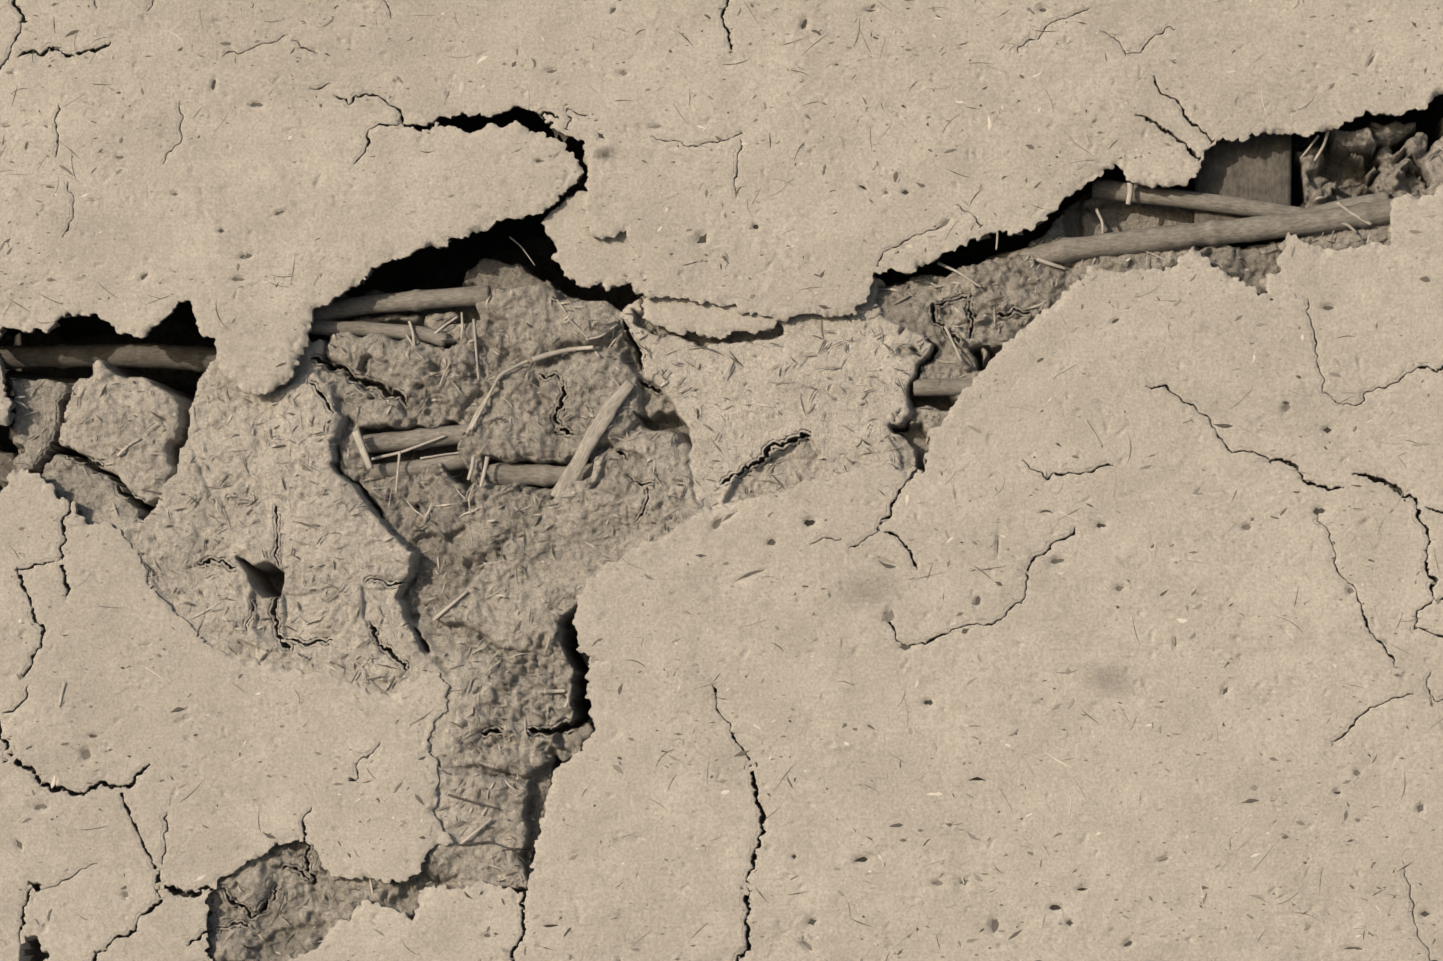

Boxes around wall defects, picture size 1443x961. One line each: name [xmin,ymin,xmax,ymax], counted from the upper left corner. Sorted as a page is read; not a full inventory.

crack [0,0,114,72]
crack [52,102,77,240]
spalling [1177,182,1195,192]
spalling [1291,118,1443,208]
crack [308,355,409,413]
crack [1020,457,1116,483]
crack [0,367,335,961]
crack [367,621,410,672]
spalling [0,191,1391,961]
crack [884,523,1079,649]
crack [1144,381,1443,744]
crack [709,684,770,961]